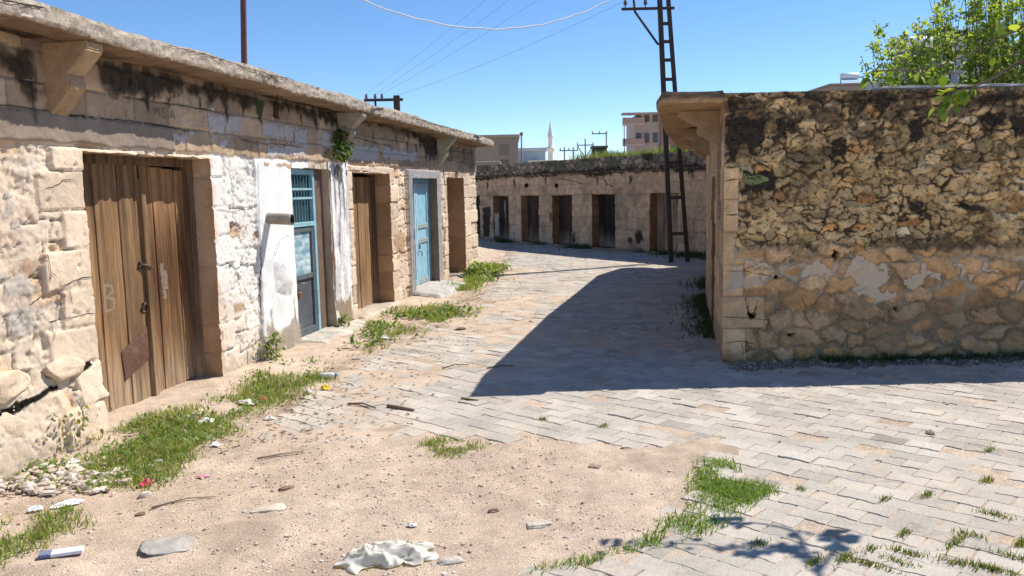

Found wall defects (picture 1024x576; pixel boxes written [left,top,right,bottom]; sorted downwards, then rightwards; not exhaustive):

damp [0,49,37,118]
peeling [798,255,941,304]